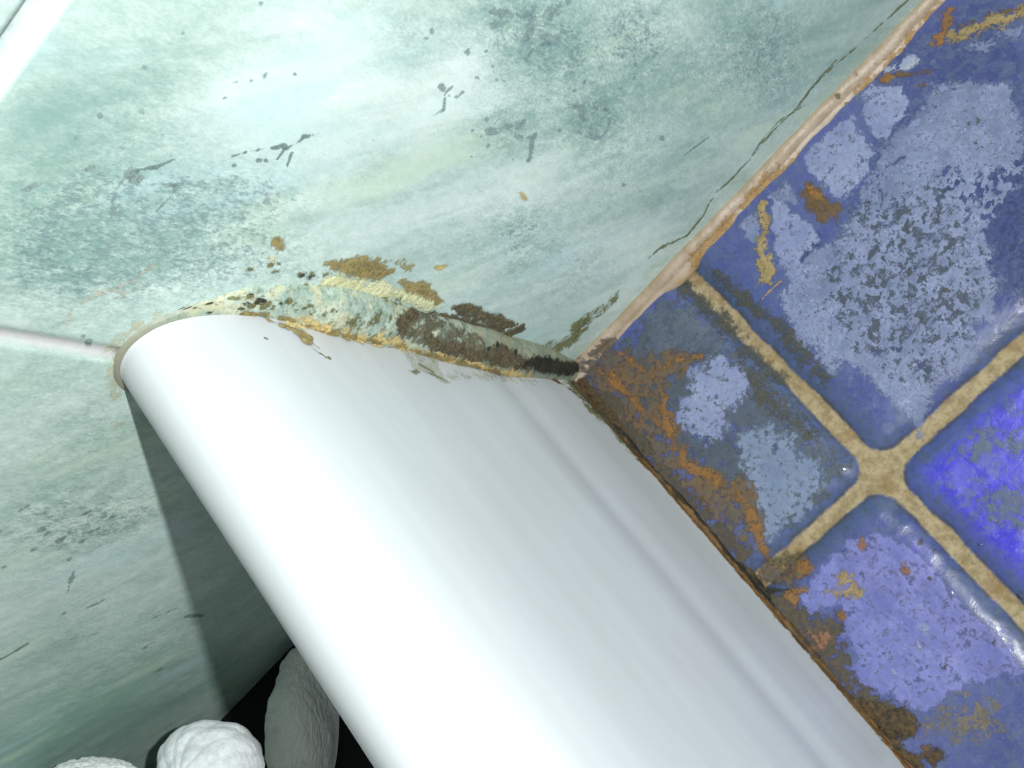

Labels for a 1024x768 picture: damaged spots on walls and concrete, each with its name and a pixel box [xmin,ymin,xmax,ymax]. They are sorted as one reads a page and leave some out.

rust [835,2,1024,105]
rust [688,152,799,300]
crack [649,0,909,258]
rust [800,182,845,224]
peeling [293,328,331,360]
rust [577,337,896,711]